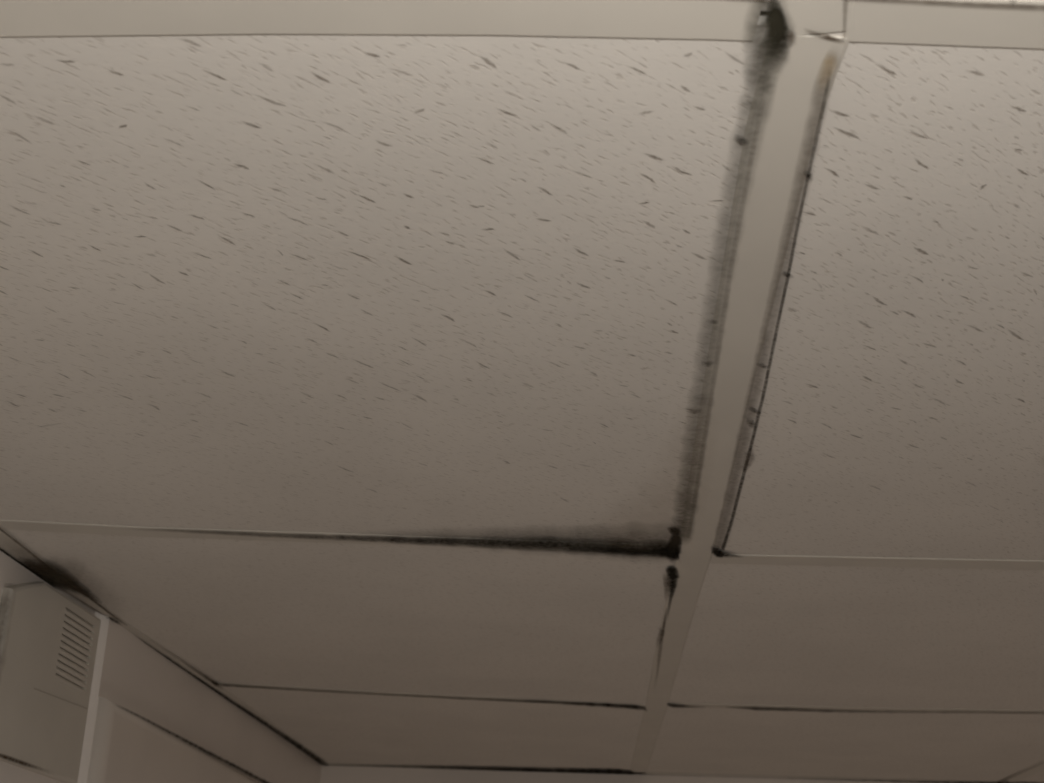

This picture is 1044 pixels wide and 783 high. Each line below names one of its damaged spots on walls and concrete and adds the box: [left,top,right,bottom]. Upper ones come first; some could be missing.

leakage [755,0,792,65]
leakage [27,564,94,598]
leakage [300,520,686,601]
leakage [712,547,736,557]